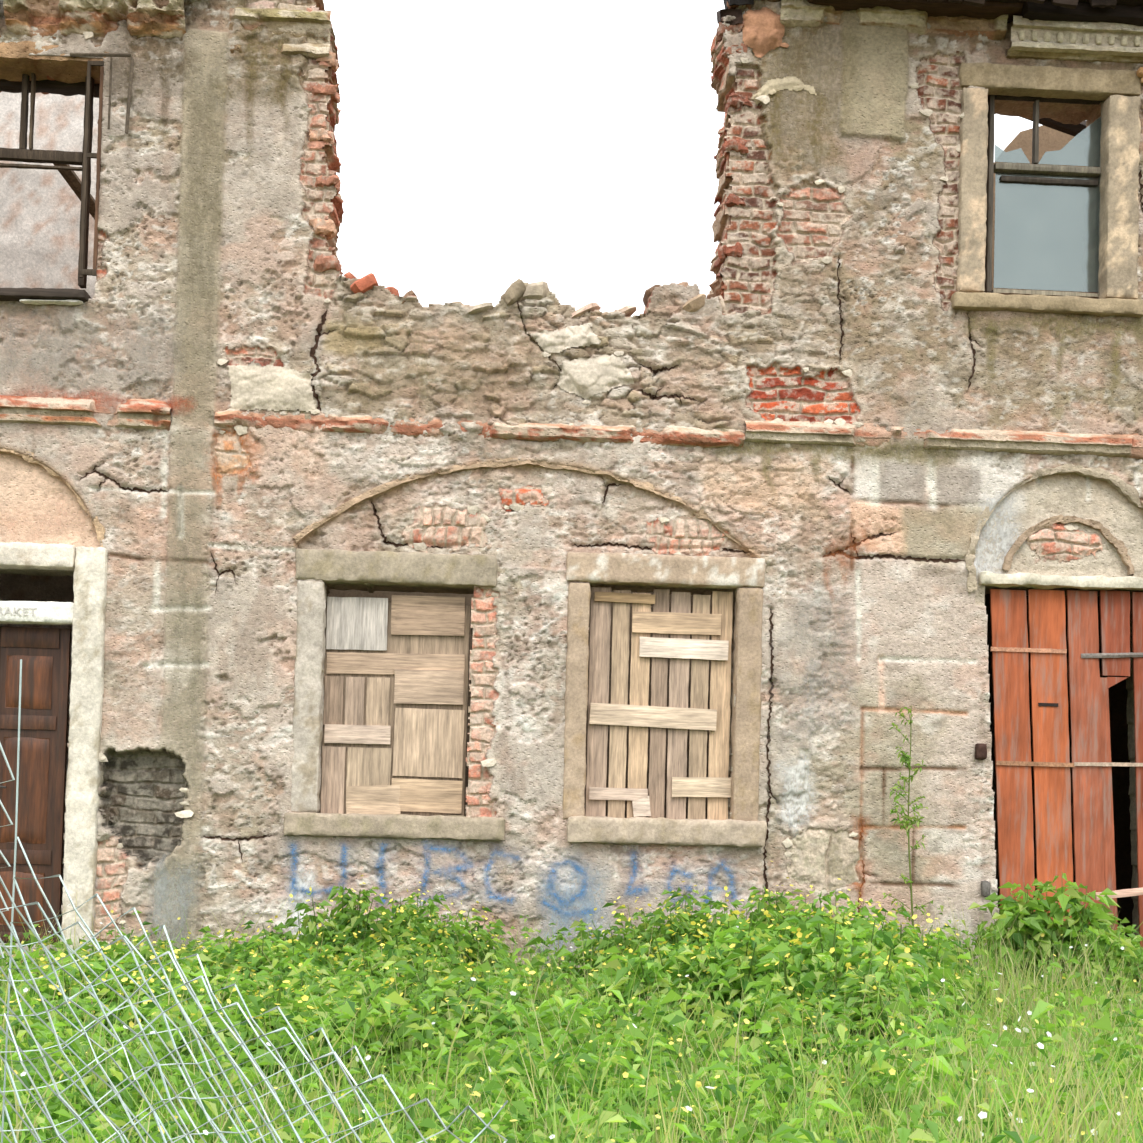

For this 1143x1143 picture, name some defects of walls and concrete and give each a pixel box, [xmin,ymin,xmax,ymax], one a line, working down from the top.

spalling [290,33,340,306]
spalling [719,57,853,317]
spalling [909,51,967,311]
crack [1135,170,1143,212]
crack [310,311,337,411]
crack [512,282,562,391]
spalling [746,361,864,428]
crack [371,501,443,548]
spalling [403,502,492,553]
spalling [646,516,728,556]
spalling [465,587,499,818]
spalling [94,749,194,944]